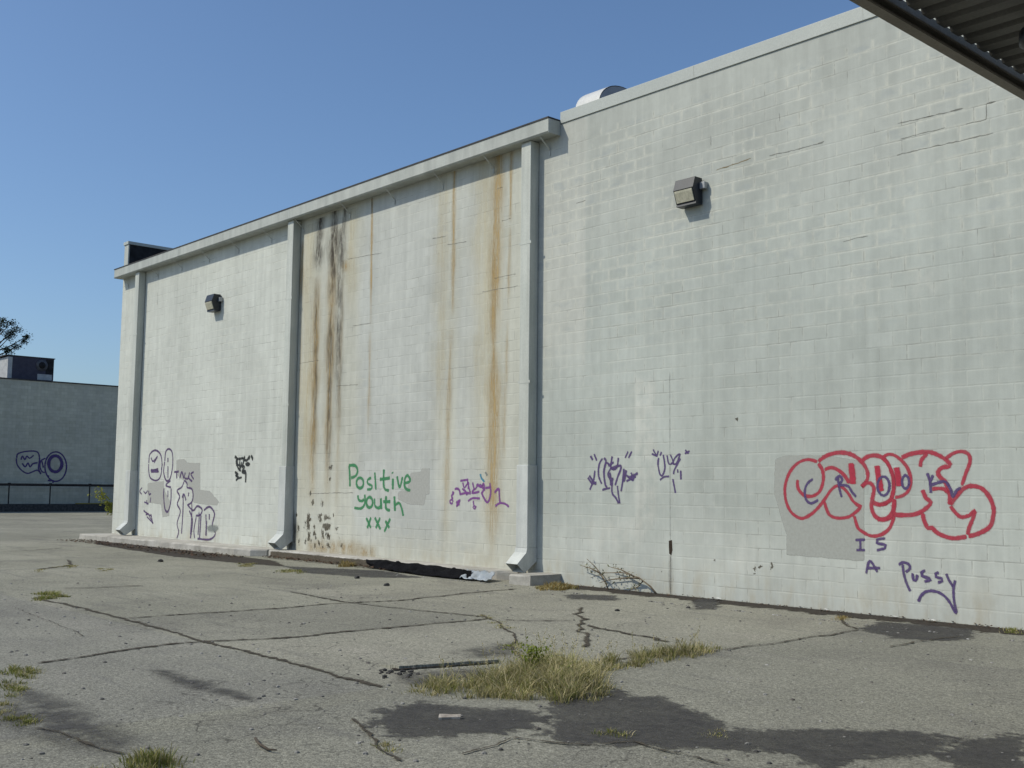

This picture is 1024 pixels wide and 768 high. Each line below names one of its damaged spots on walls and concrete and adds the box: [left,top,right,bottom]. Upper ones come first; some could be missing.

rust [492,155,512,360]
rust [311,279,333,464]